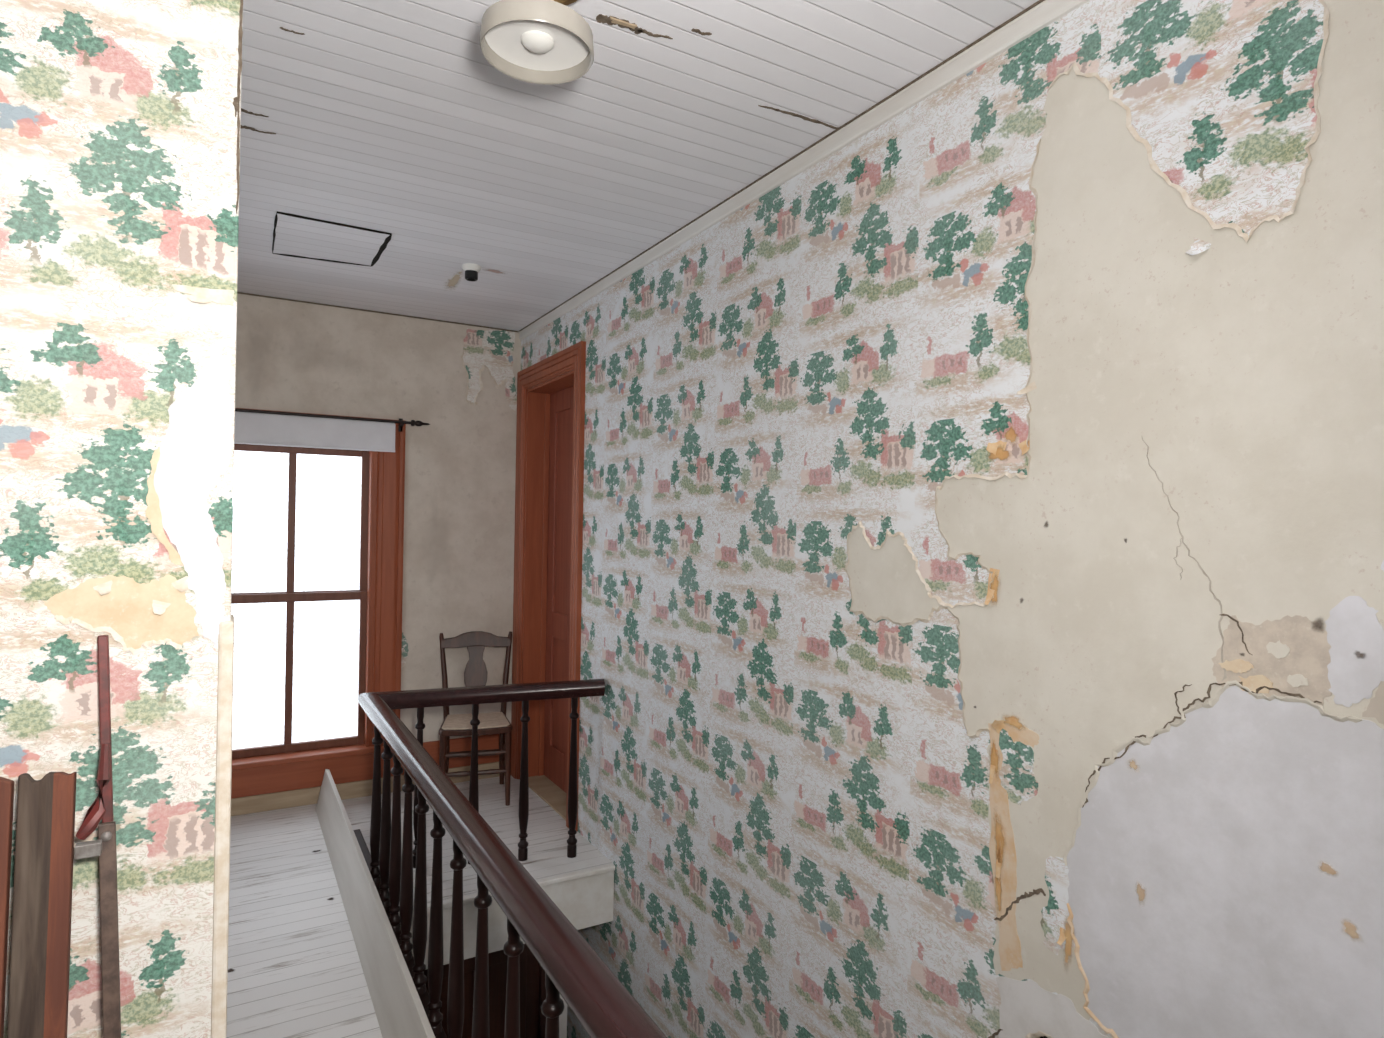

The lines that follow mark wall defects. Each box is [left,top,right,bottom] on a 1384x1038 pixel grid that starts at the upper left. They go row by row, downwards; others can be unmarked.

peeling [1186,237,1211,255]
flaking render [146,343,233,646]
crack [1082,438,1322,808]
flaking render [995,596,1384,1038]